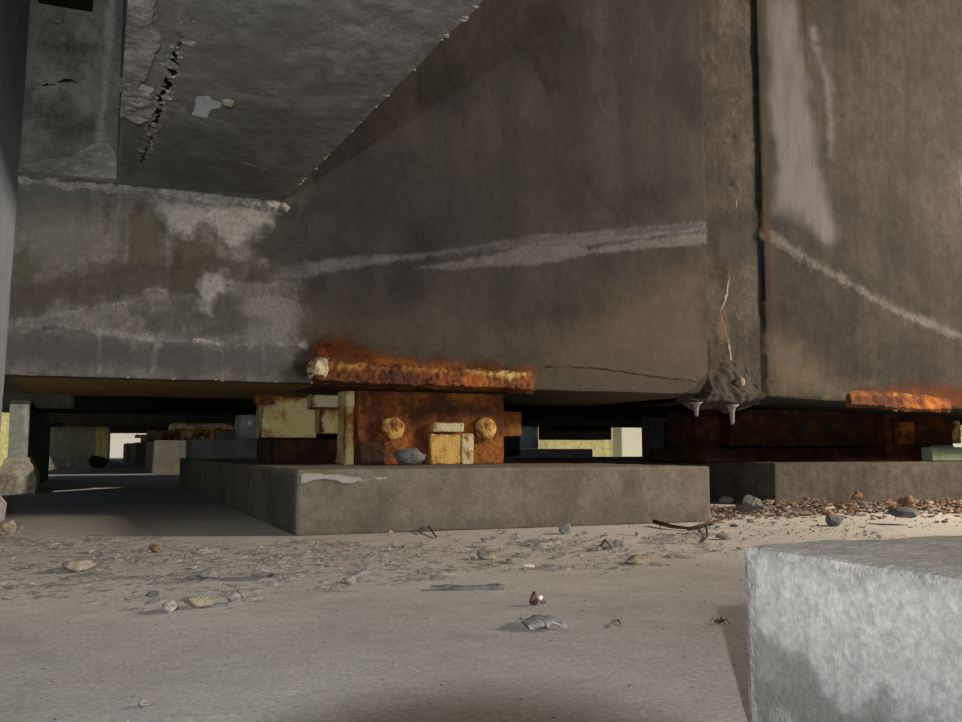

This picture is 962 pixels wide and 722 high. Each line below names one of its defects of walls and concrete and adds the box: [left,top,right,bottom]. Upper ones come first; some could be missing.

crack [36,78,78,86]
spalling [118,0,162,124]
leakage [765,0,835,249]
corrosion [311,337,538,377]
leakage [6,193,960,399]
leakage [466,346,766,424]
crack [715,263,733,360]